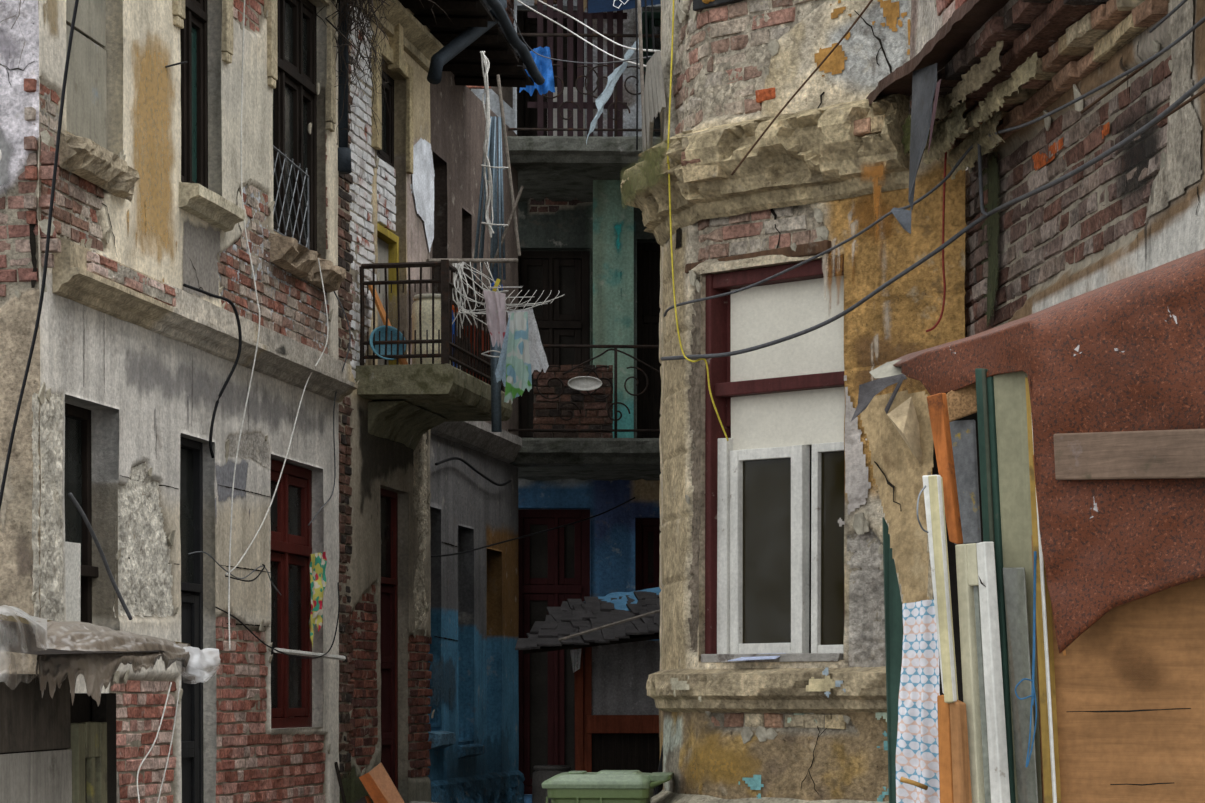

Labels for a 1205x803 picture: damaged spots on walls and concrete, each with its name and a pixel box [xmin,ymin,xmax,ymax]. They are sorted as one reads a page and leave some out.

flaking render [672,0,816,183]
peeling [814,32,850,77]
peeling [830,0,851,19]
crack [854,10,892,73]
peeling [872,0,910,55]
flaking render [934,0,967,25]
flaking render [0,78,176,307]
flaking render [217,0,380,384]
flaking render [964,0,1202,338]
flaking render [216,396,379,803]
flaking render [111,669,183,803]
peeling [738,775,764,799]